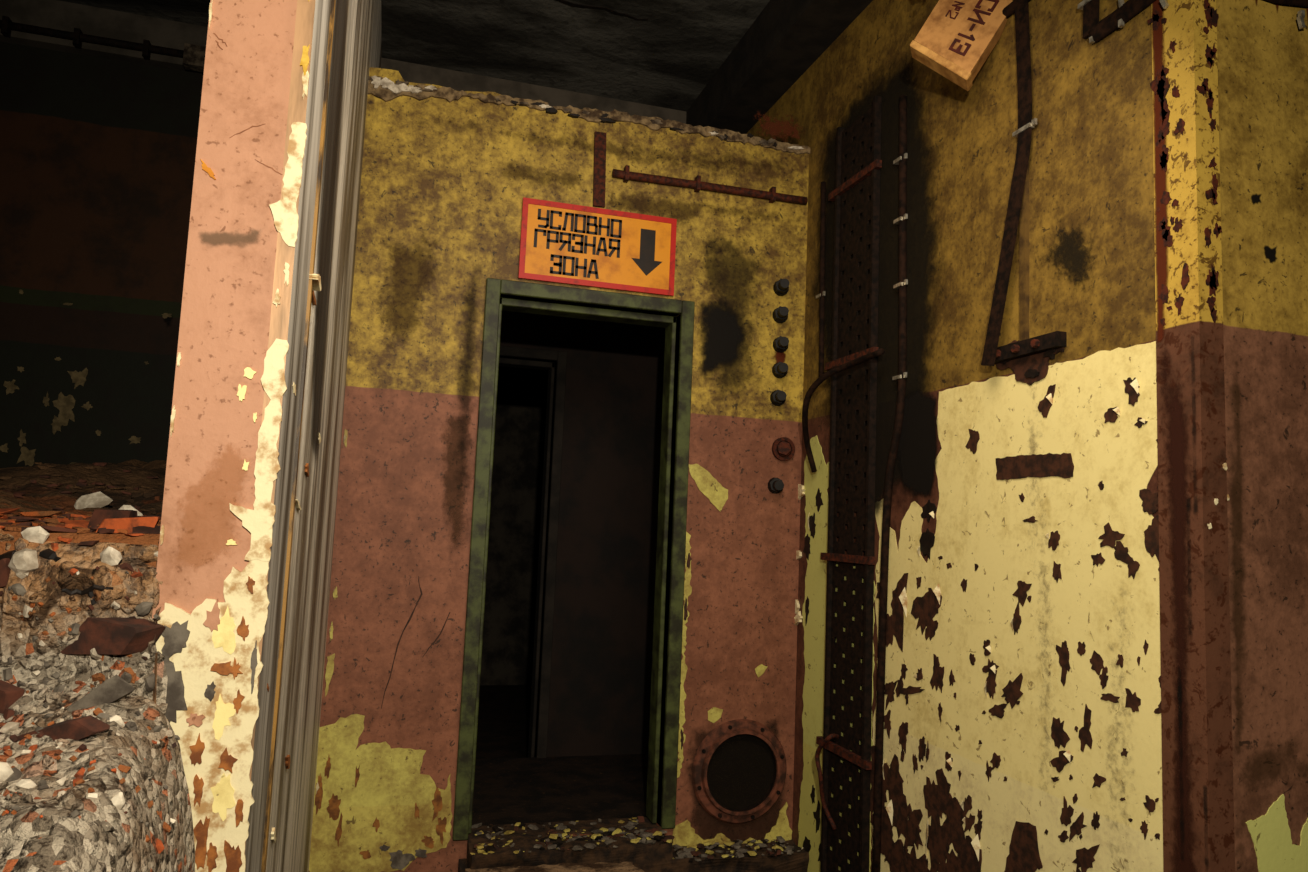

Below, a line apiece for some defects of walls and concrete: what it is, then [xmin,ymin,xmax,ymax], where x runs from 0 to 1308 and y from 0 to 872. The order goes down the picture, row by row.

crack [556,0,648,20]
rust [1204,222,1222,248]
peeling [309,274,321,316]
peeling [43,357,93,435]
peeling [0,429,36,466]
rust [1147,0,1219,872]
peeling [156,338,296,872]
peeling [672,340,1164,872]
peeling [309,714,453,872]
peeling [1246,794,1308,872]